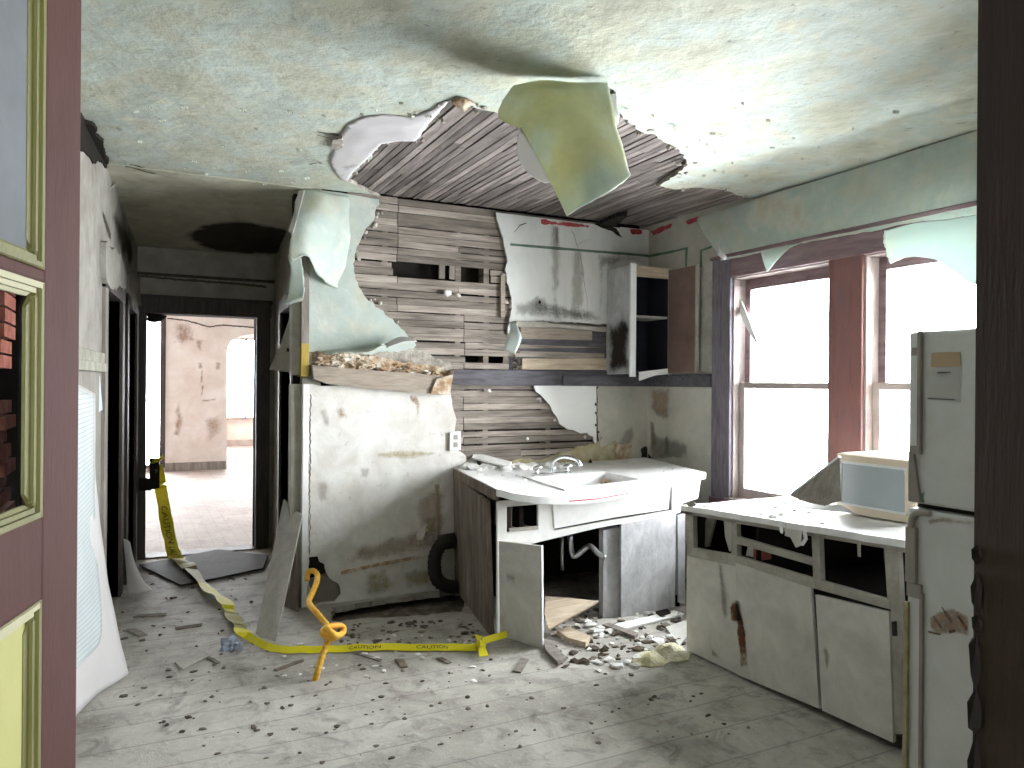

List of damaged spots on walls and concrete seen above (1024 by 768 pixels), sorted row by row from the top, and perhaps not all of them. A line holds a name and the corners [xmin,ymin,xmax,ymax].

spalling [80,113,109,168]
leakage [190,223,286,254]
flaking render [315,97,749,475]
spalling [309,554,429,602]
rust [731,603,747,665]